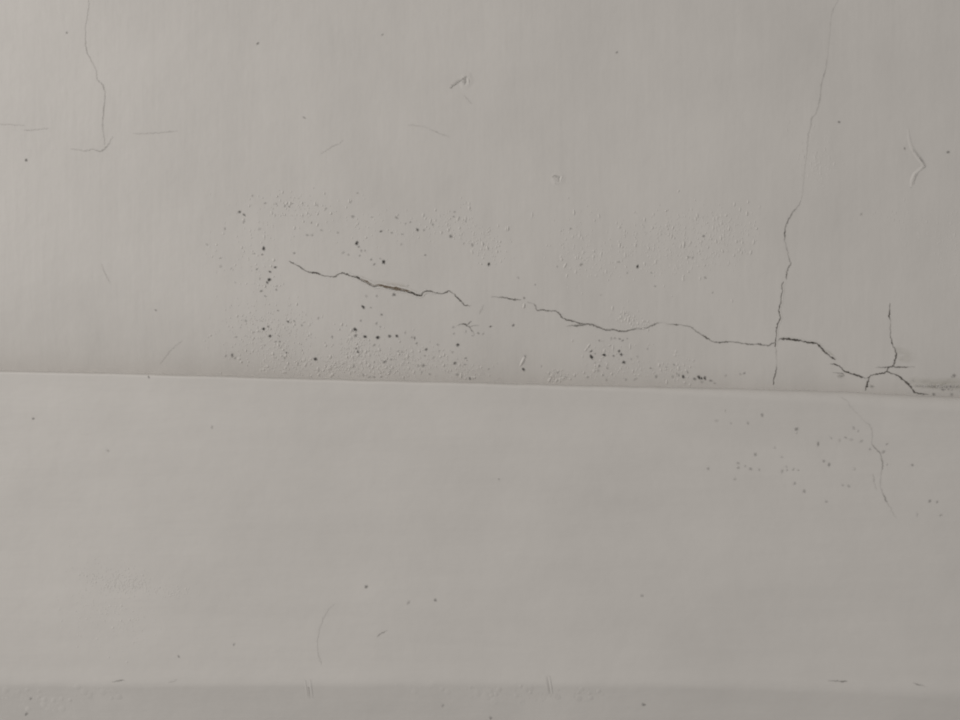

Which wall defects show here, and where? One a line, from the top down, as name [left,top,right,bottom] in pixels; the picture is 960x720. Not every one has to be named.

crack [70,0,177,152]
crack [289,0,928,518]
water stain [352,294,492,380]